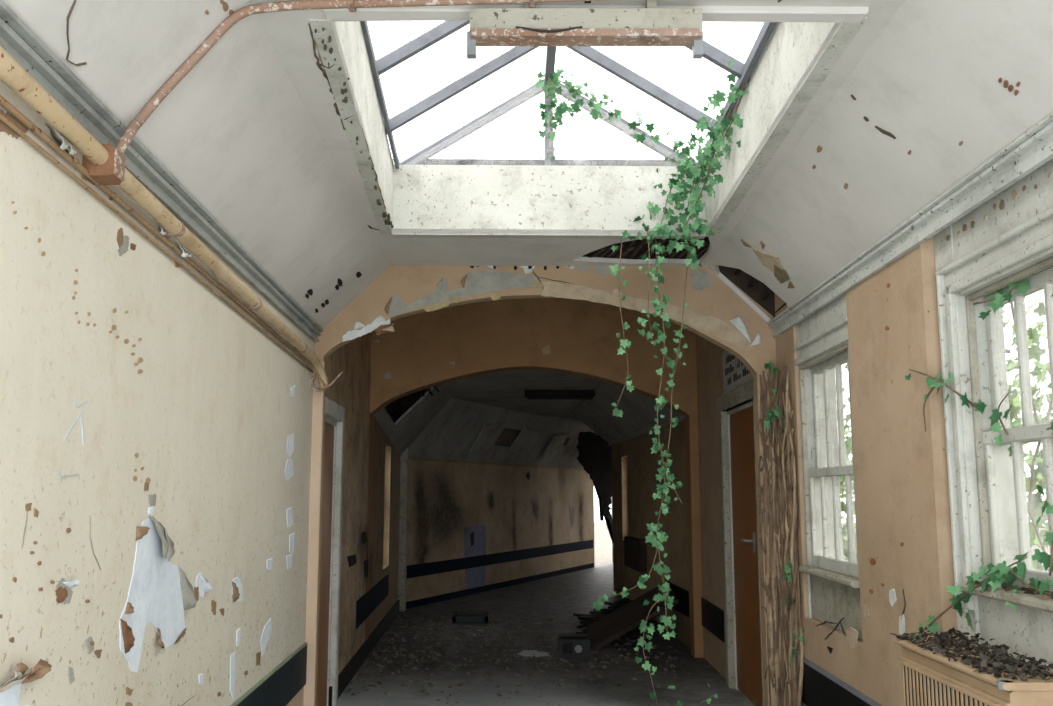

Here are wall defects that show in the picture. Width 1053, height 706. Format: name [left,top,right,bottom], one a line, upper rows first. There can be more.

flaking render [740,239,795,289]
flaking render [343,266,761,351]
peeling [119,482,243,672]
peeling [0,659,52,706]
peeling [84,636,102,658]
peeling [217,618,272,701]